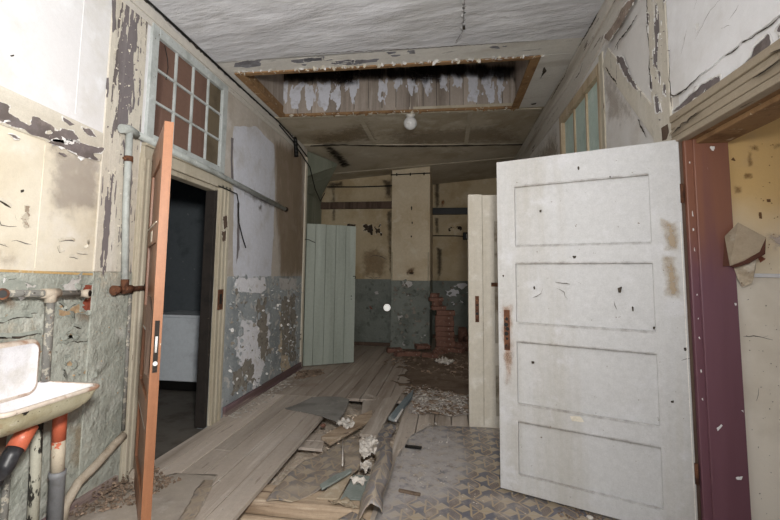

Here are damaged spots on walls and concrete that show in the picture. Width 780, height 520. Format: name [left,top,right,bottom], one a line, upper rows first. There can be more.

water stain [284,64,515,84]
crack [283,0,527,57]
peeling [603,0,635,42]
peeling [616,54,639,91]
peeling [645,0,666,121]
peeling [672,73,722,113]
peeling [732,23,780,72]
peeling [222,126,304,396]
peeling [439,281,468,328]